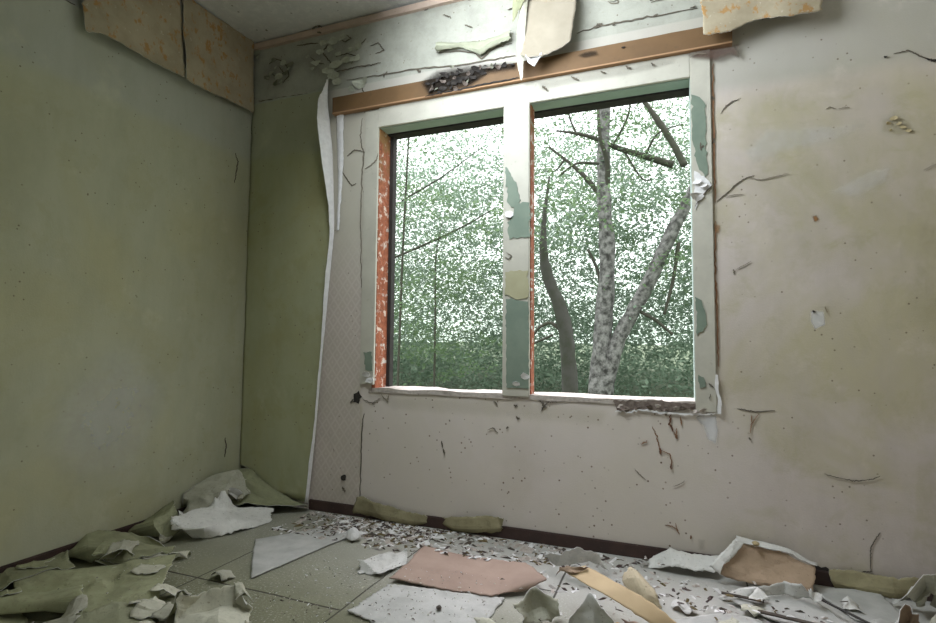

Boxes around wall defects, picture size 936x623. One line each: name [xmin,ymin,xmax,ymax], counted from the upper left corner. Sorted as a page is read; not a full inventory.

crack [884,50,936,62]
crack [717,173,788,201]
crack [737,408,775,440]